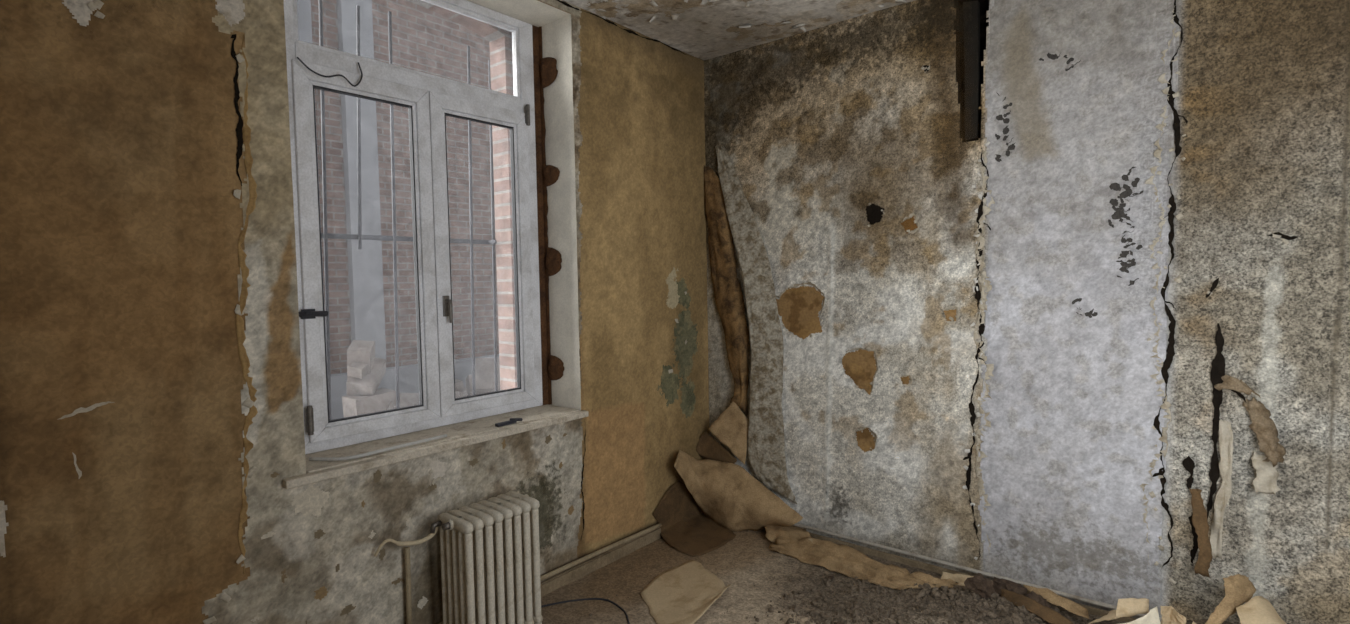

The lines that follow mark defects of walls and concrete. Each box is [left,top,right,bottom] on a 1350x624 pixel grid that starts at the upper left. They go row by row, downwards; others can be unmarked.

peeling [62,0,105,27]
peeling [725,0,906,46]
crack [231,34,243,186]
peeling [538,0,719,404]
peeling [202,0,584,624]
water stain [514,463,566,554]
water stain [656,267,698,418]
peeling [776,282,825,340]
peeling [842,348,879,395]
peeling [856,427,878,452]
peeling [944,0,1182,619]
crack [1140,0,1246,585]